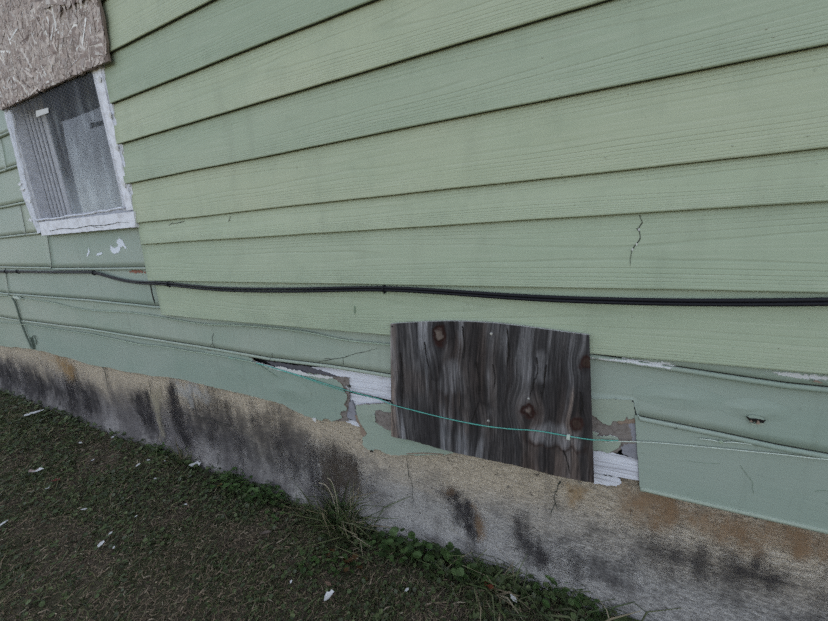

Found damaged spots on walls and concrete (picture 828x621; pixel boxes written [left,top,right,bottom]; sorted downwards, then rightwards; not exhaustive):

water stain [0,362,99,414]
water stain [130,384,206,448]
peeling [591,398,638,460]
water stain [447,489,481,542]
water stain [517,523,549,570]